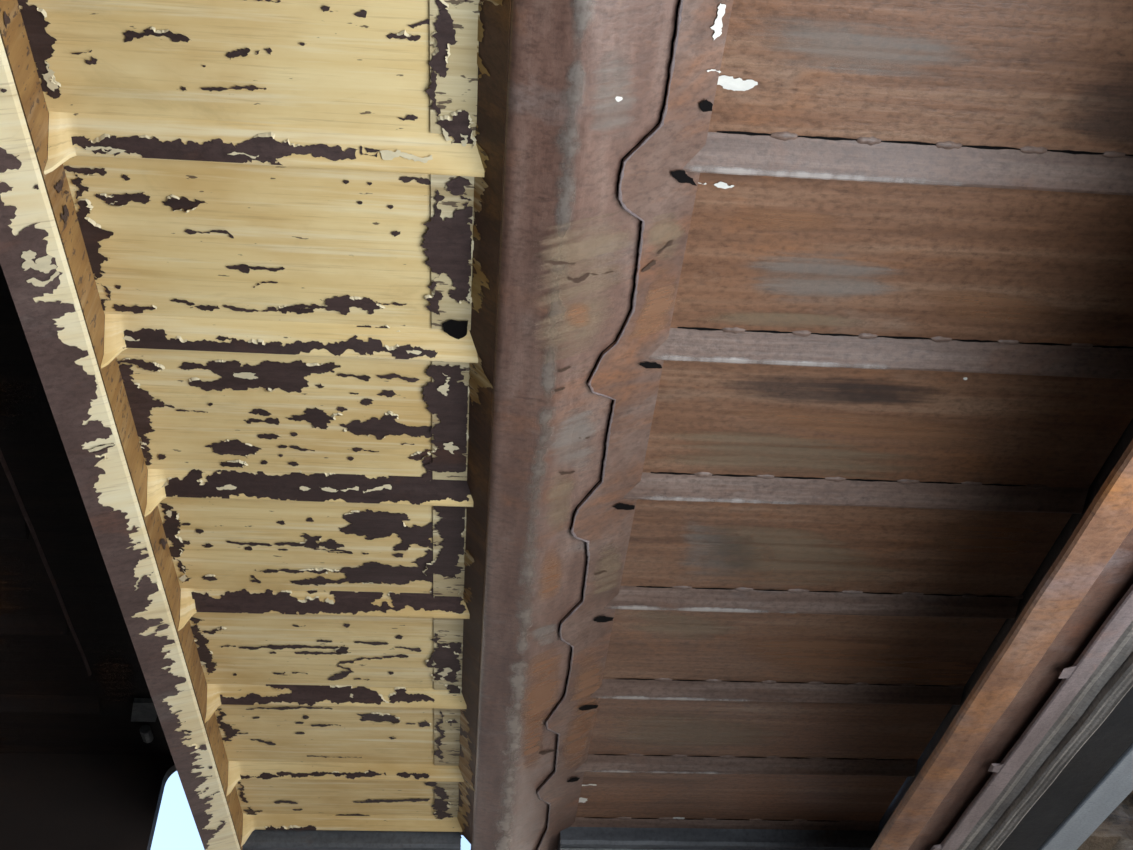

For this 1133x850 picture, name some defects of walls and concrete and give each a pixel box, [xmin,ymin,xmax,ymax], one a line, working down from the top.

peeling [123,27,190,43]
peeling [387,0,458,78]
peeling [710,3,726,40]
peeling [707,69,758,91]
peeling [71,132,357,165]
peeling [436,110,477,149]
peeling [421,176,474,315]
peeling [0,147,225,850]
peeling [117,295,471,675]
peeling [415,633,463,694]
peeling [216,672,435,742]
peeling [240,770,453,820]